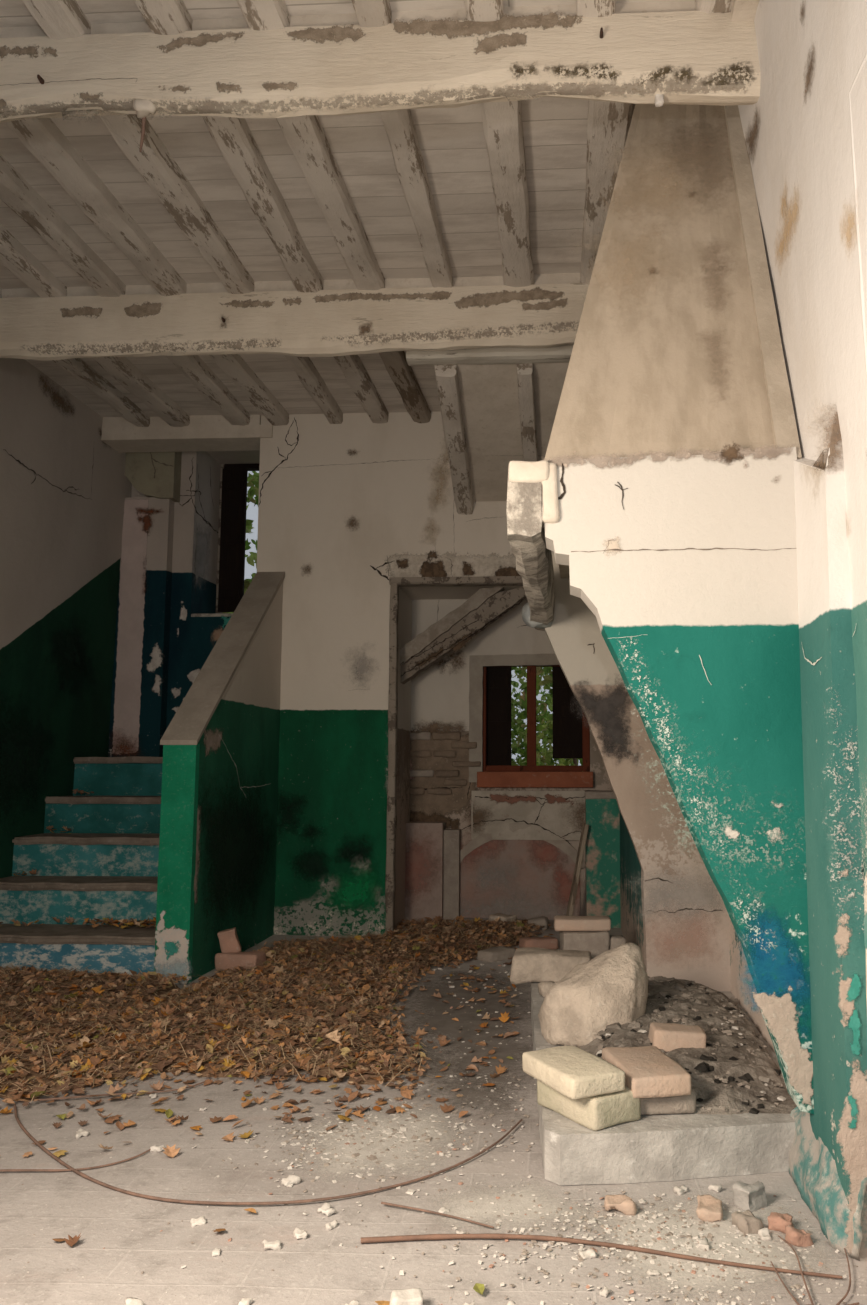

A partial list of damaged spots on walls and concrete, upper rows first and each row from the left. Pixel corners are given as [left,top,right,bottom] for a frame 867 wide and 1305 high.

peeling [0,76,745,118]
peeling [221,287,579,344]
crack [6,451,94,499]
crack [259,418,429,505]
flaking render [548,443,791,468]
corrosion [136,508,161,533]
peeling [147,643,200,712]
peeling [622,638,797,866]
leakage [199,782,372,925]
peeling [824,708,867,1027]
peeling [753,986,814,1108]
peeling [836,1060,867,1255]